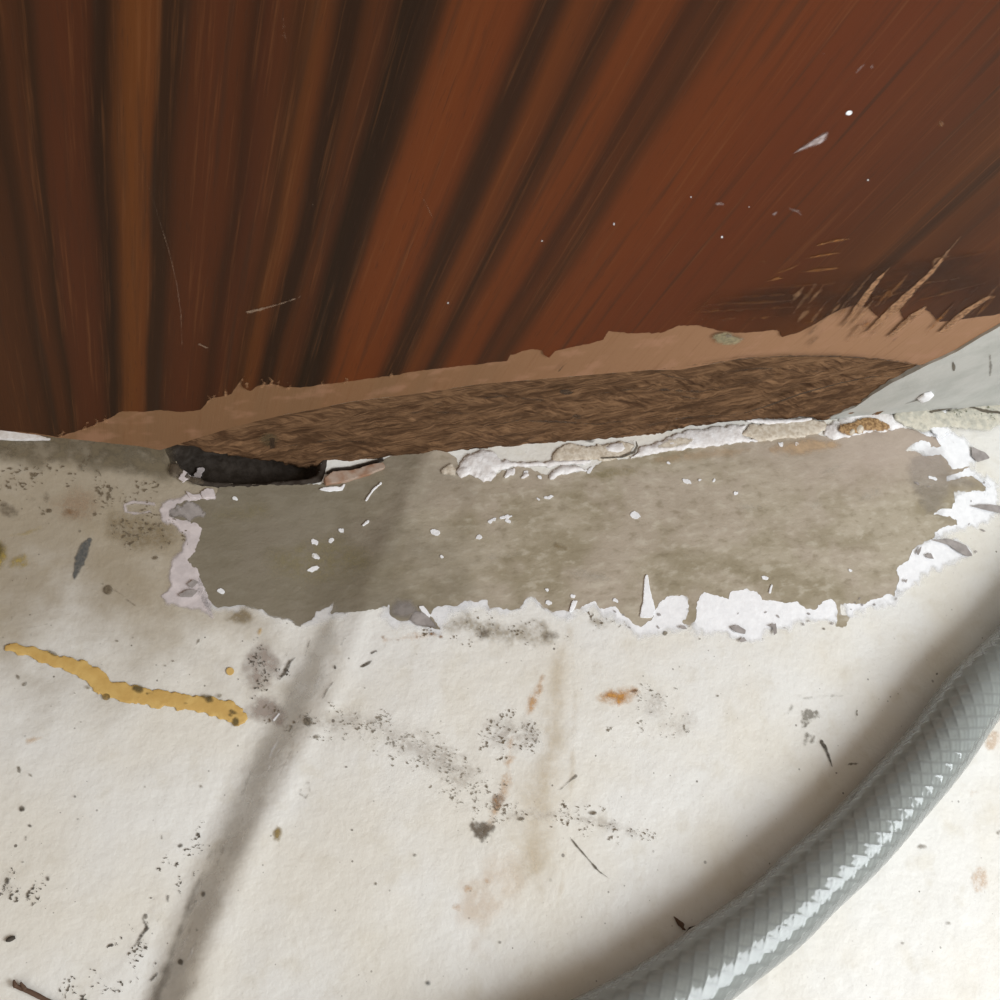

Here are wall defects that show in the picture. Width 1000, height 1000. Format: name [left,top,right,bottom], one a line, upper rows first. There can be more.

peeling [160,405,1000,642]
water stain [328,702,488,812]
water stain [478,709,541,761]
water stain [551,800,656,841]